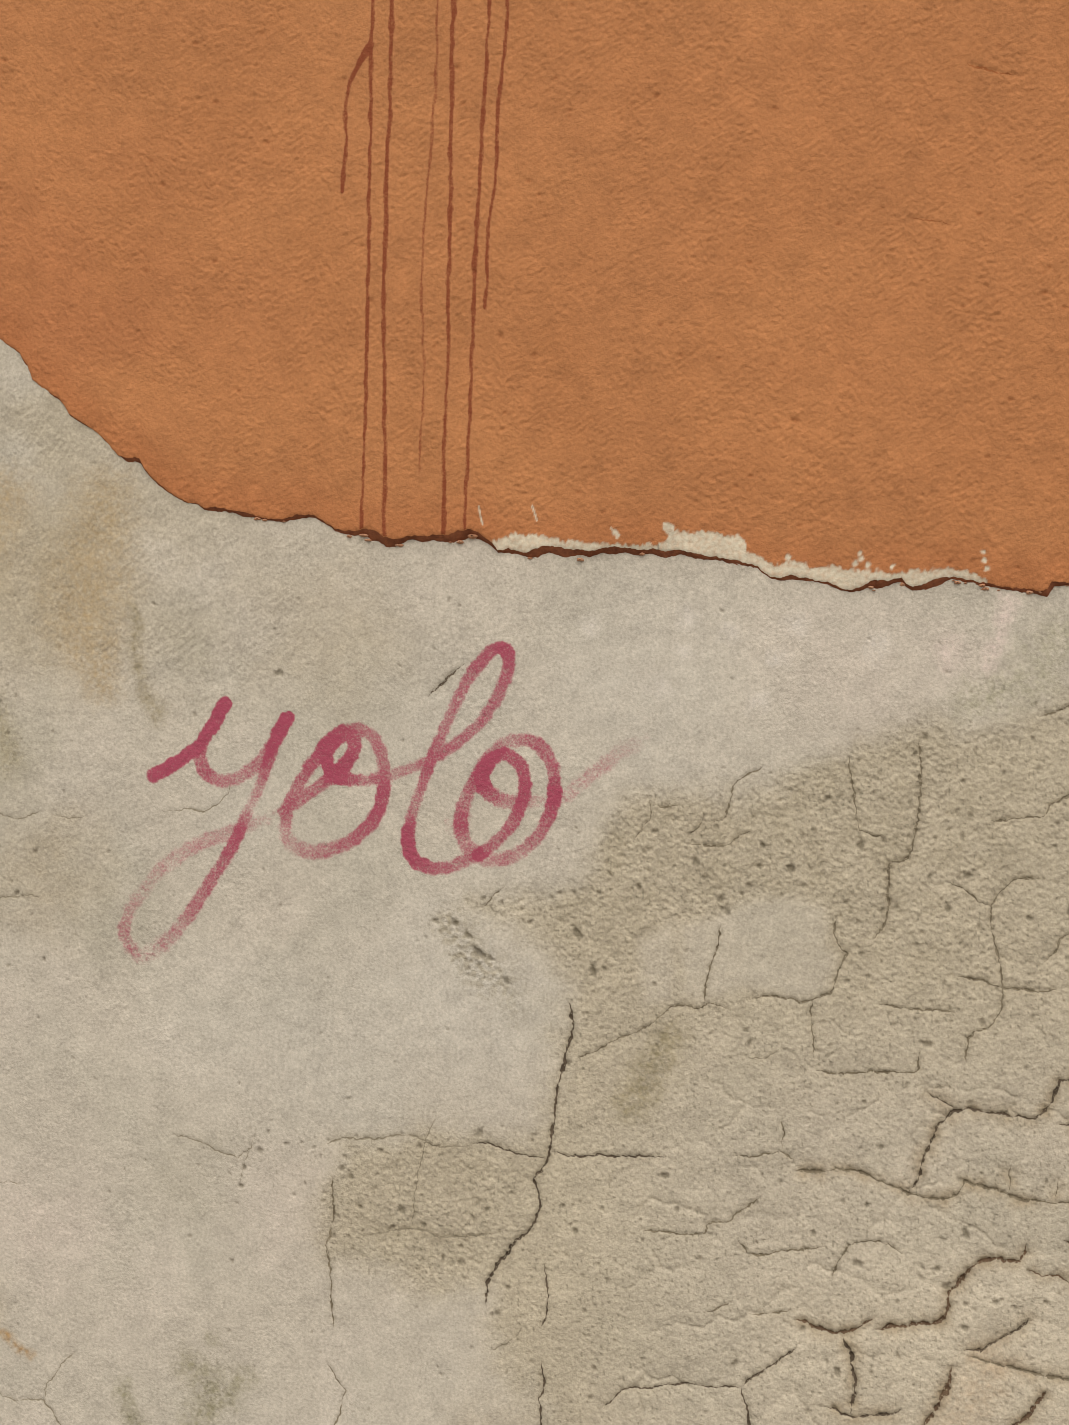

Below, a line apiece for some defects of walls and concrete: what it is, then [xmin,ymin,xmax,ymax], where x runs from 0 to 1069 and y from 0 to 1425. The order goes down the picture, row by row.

crack [428,664,464,697]
flaking render [0,339,1069,1425]
crack [325,743,1069,1327]
crack [493,1269,549,1350]
crack [603,1241,1069,1425]
crack [328,1365,346,1425]
crack [538,1363,546,1425]